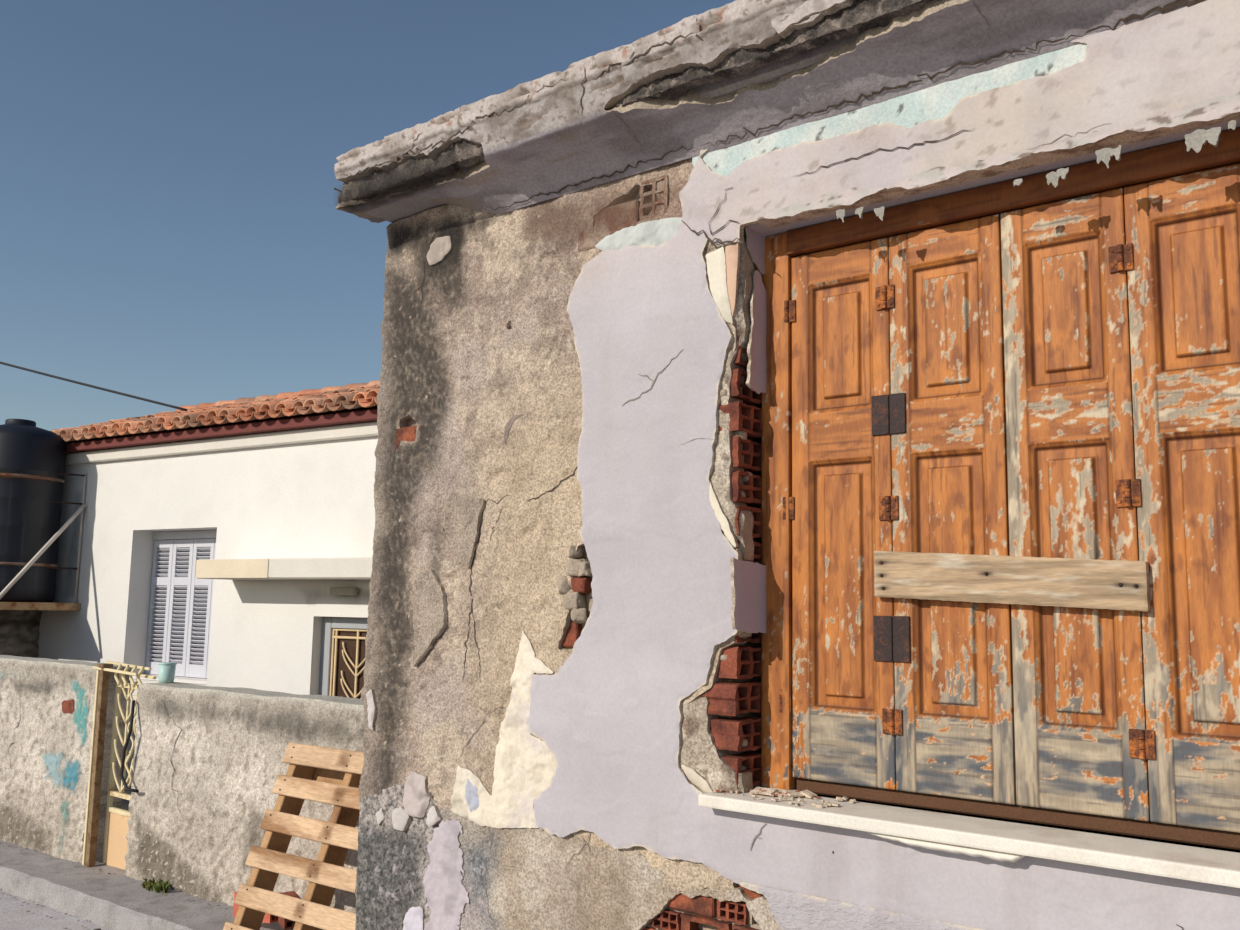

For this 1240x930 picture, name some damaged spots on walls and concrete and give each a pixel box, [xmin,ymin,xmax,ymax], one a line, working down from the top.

crack [336,14,703,180]
crack [482,0,1205,211]
damp [378,219,480,794]
crack [417,467,577,760]
crack [622,350,682,406]
spalling [338,43,1087,930]
spalling [680,91,1240,793]